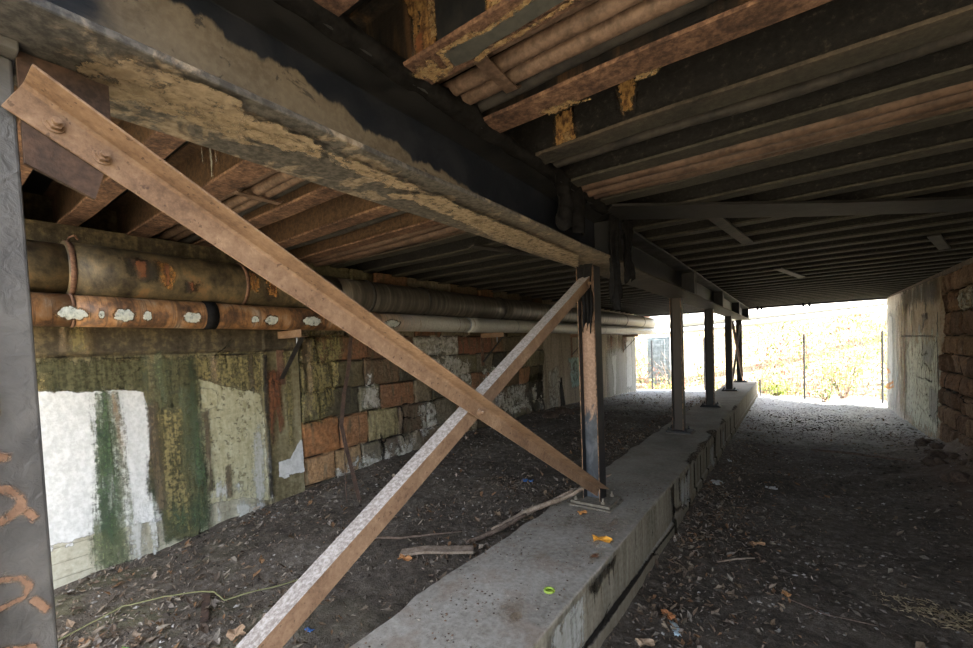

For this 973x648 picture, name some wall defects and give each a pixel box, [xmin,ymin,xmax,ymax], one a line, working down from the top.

peeling [404,0,574,83]
peeling [75,58,579,267]
peeling [541,98,591,145]
peeling [617,67,659,112]
corrosion [248,270,278,298]
leakage [36,351,267,568]
leakage [551,541,616,648]